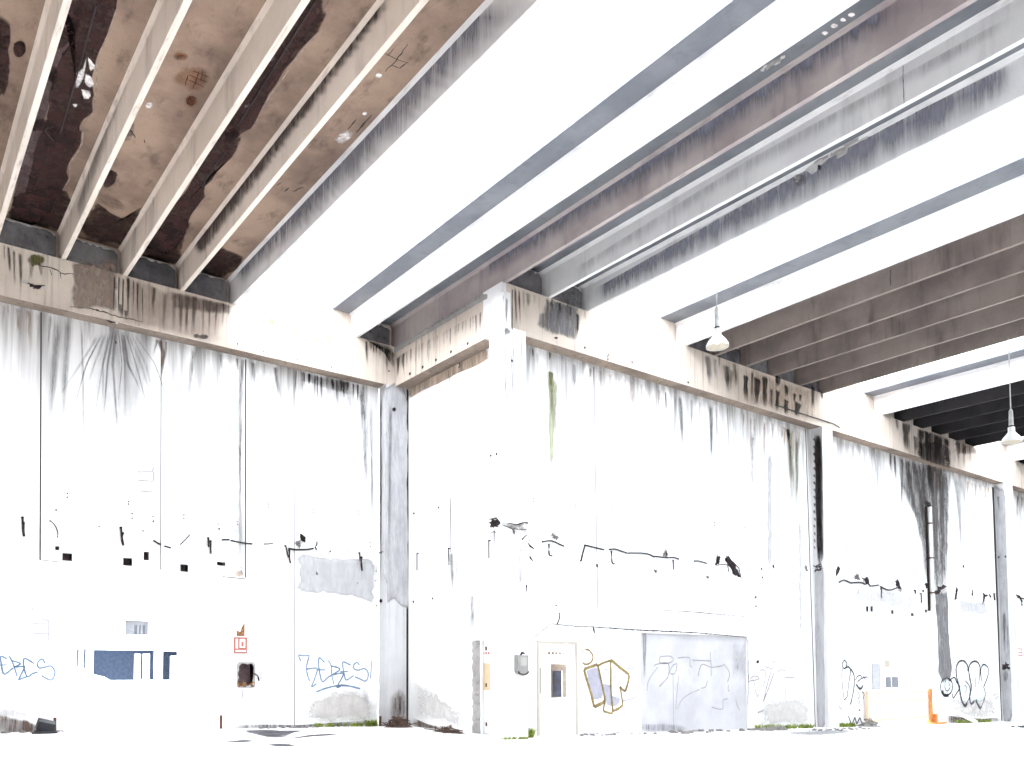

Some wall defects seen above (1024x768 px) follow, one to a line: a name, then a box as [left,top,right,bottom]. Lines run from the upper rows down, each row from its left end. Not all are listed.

crack [185,71,208,89]
crack [384,44,408,70]
leakage [489,12,880,269]
leakage [604,70,1002,294]
spalling [794,136,868,183]
leakage [163,294,226,339]
leakage [539,300,579,339]
leakage [365,339,411,373]
leakage [409,350,487,397]
leakage [725,366,823,414]
leakage [889,420,1023,723]
spalling [237,662,260,688]